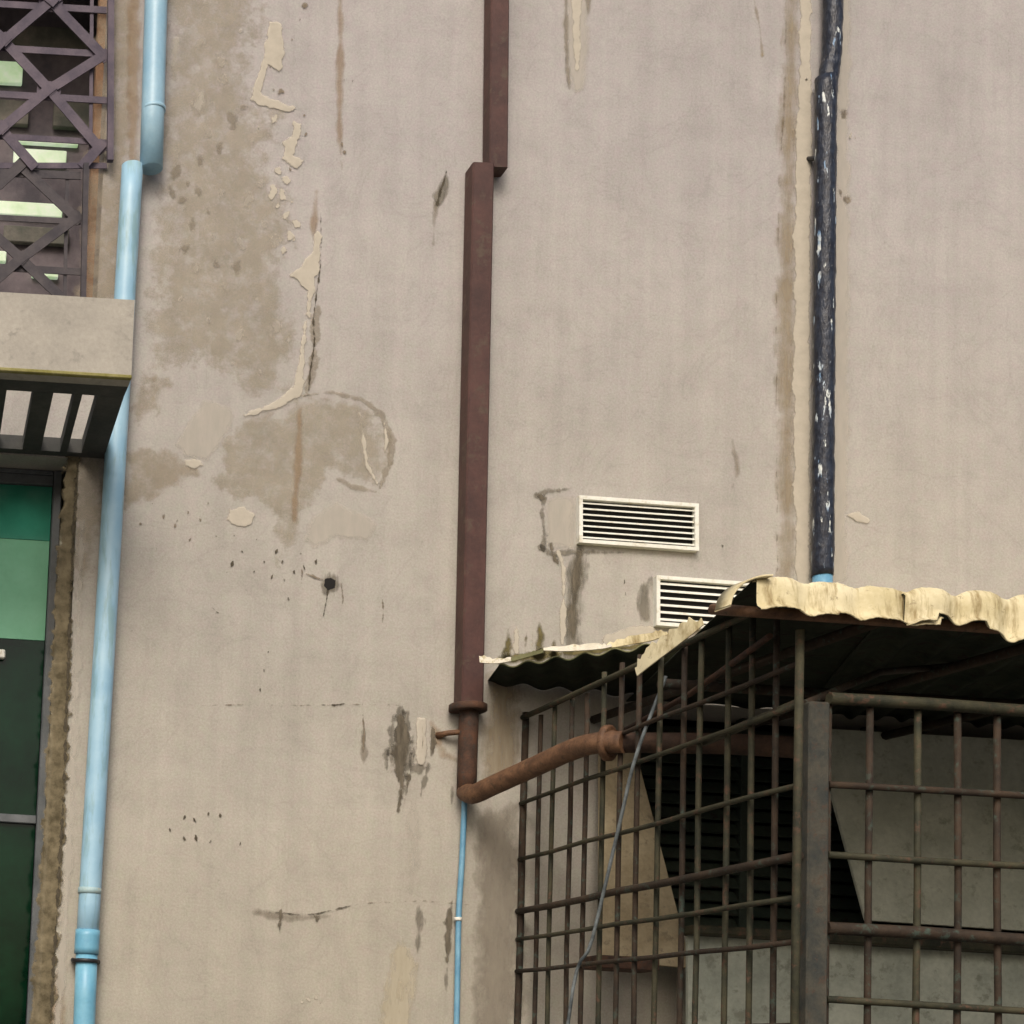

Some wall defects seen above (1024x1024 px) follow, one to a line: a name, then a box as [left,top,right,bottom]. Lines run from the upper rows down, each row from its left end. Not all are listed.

peeling [227,21,307,254]
peeling [244,231,322,416]
crack [308,220,322,391]
water stain [792,0,813,584]
spalling [293,553,344,616]
water stain [499,542,656,664]
water stain [384,706,429,812]
crack [256,902,372,930]